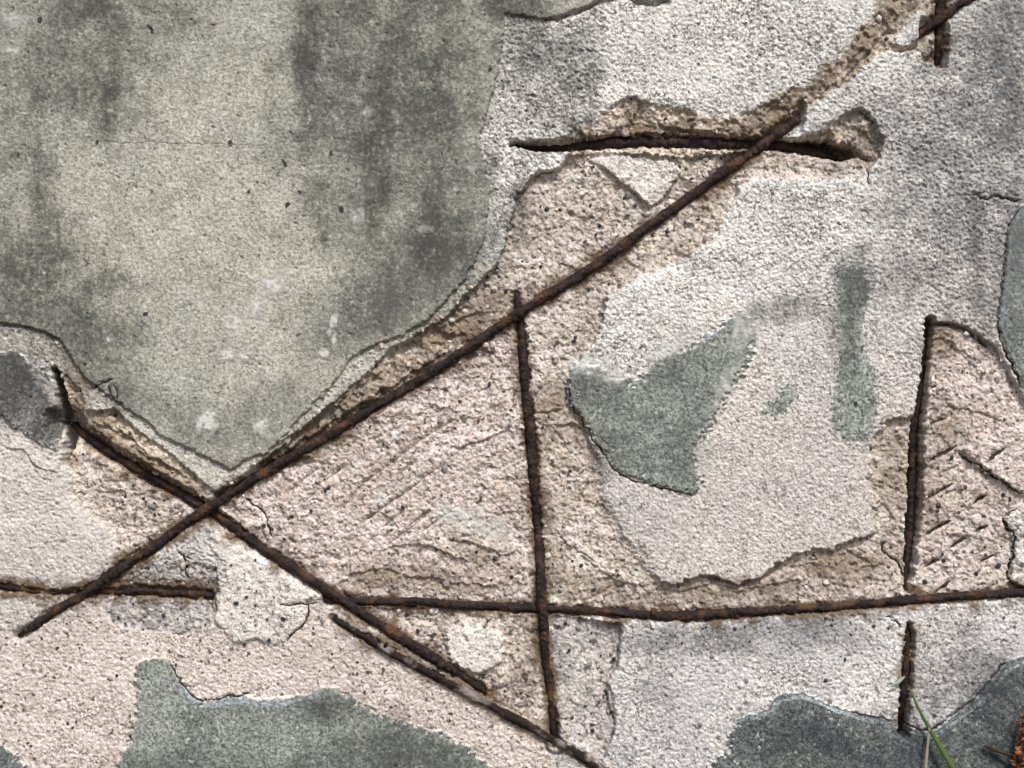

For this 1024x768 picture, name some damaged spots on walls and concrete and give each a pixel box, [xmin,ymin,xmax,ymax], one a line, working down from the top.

leakage [23,0,145,112]
leakage [293,0,497,332]
corrosion [673,25,878,218]
corrosion [929,0,953,67]
leakage [0,233,125,378]
leakage [196,409,219,433]
leakage [319,315,337,357]
flaking render [0,0,1024,611]
corrosion [0,205,1024,768]
leakage [568,353,624,399]
flaking render [0,516,587,768]
flaking render [548,597,1024,768]